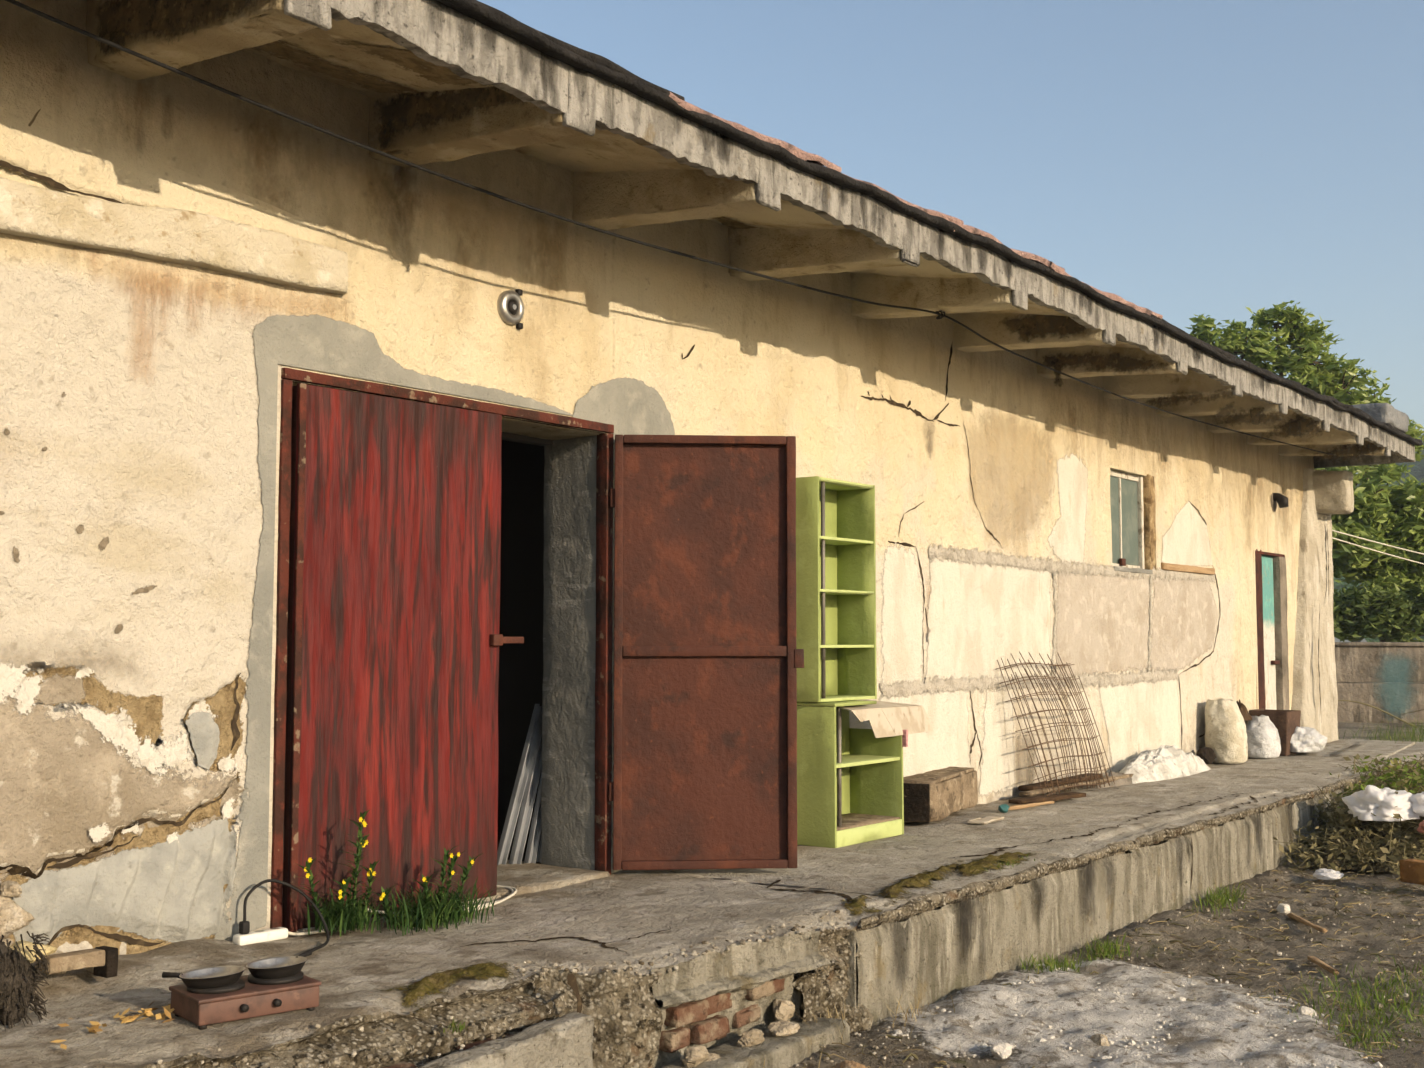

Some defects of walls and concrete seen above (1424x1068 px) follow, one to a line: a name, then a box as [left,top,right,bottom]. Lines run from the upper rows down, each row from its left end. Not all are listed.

crack [861,341,1000,543]
flaking render [880,453,1218,798]
spalling [46,924,174,955]
peeling [0,653,246,943]